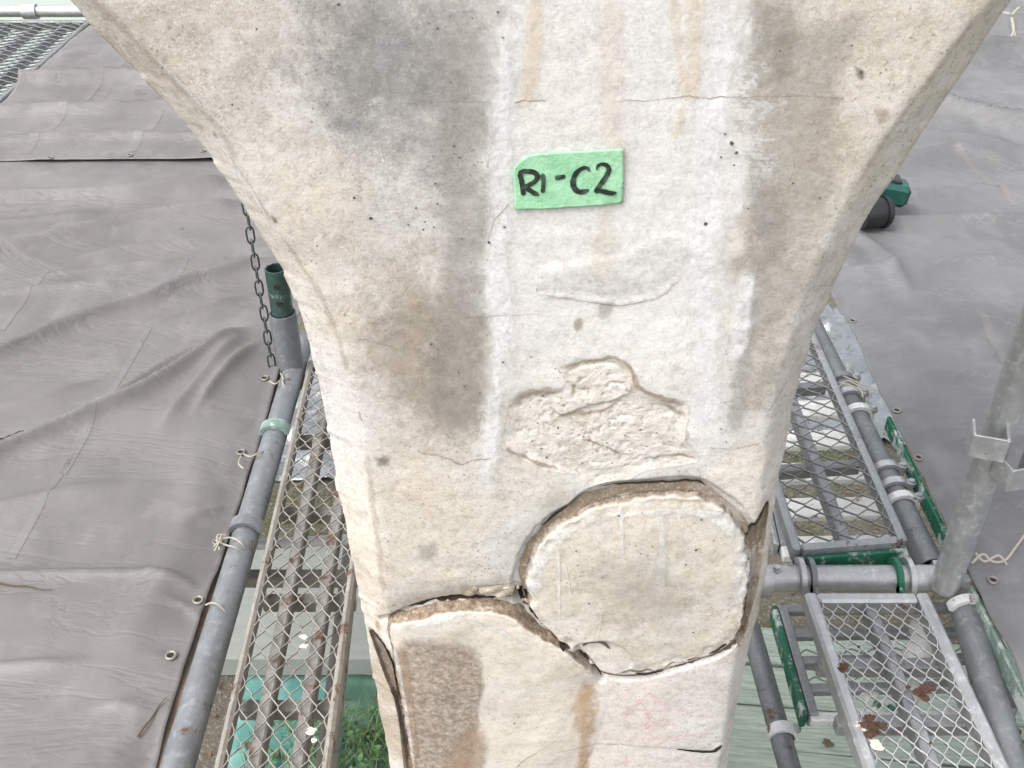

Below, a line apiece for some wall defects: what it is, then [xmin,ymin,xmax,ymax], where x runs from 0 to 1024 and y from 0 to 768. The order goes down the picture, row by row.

crack [347,98,544,106]
crack [618,94,829,102]
damp [346,12,514,483]
spalling [503,356,700,487]
crack [403,356,768,619]
crack [559,640,736,676]